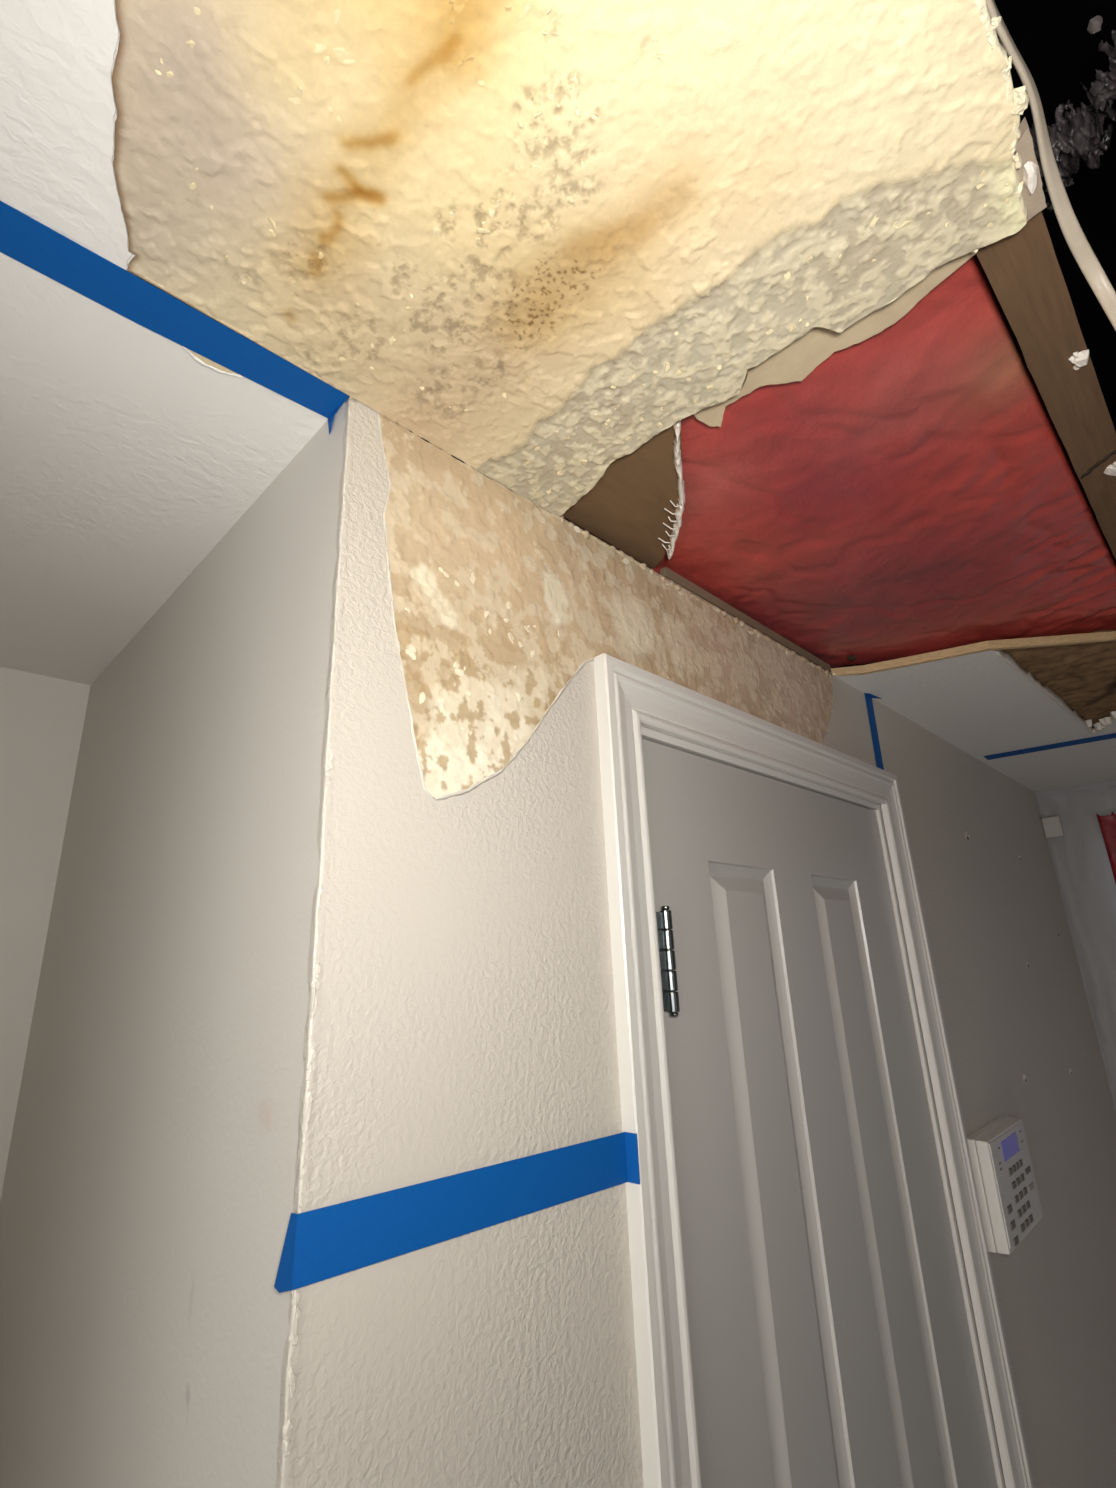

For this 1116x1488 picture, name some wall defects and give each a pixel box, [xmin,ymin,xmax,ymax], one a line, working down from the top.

peeling [594,362,691,433]
peeling [377,412,834,800]